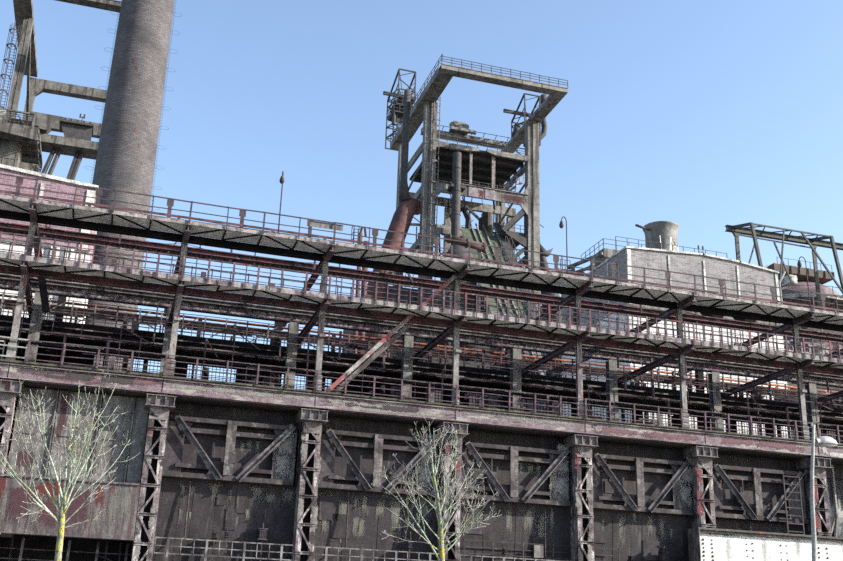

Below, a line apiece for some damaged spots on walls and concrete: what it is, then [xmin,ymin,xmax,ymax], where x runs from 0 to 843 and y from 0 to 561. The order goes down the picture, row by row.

rust [0,478,115,531]
water stain [827,478,843,506]